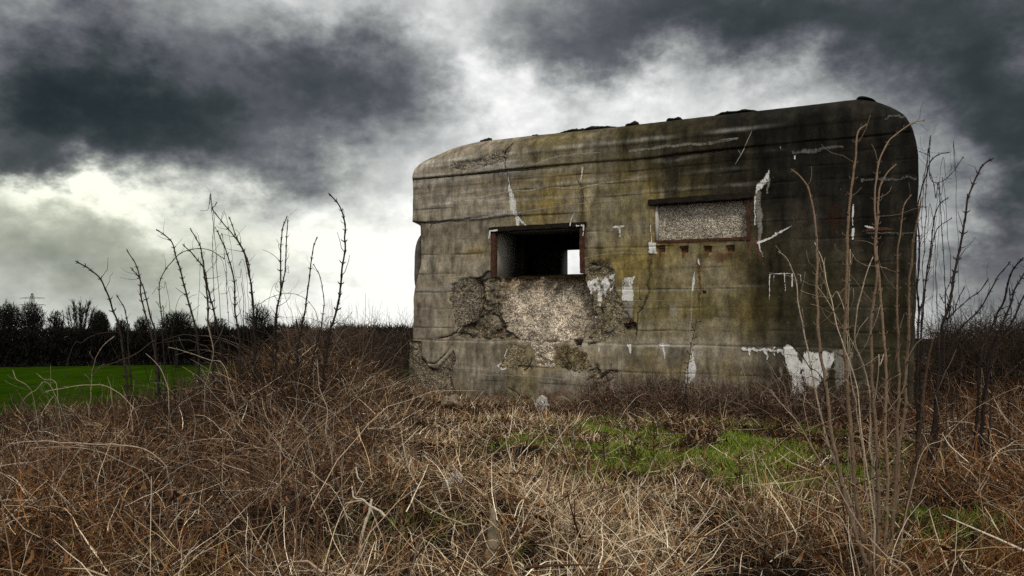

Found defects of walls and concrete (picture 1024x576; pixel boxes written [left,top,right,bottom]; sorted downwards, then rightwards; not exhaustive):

water stain [508,176,526,226]
water stain [754,171,770,225]
water stain [587,273,615,321]
spalling [449,263,637,403]
water stain [680,351,697,409]
water stain [741,345,834,404]